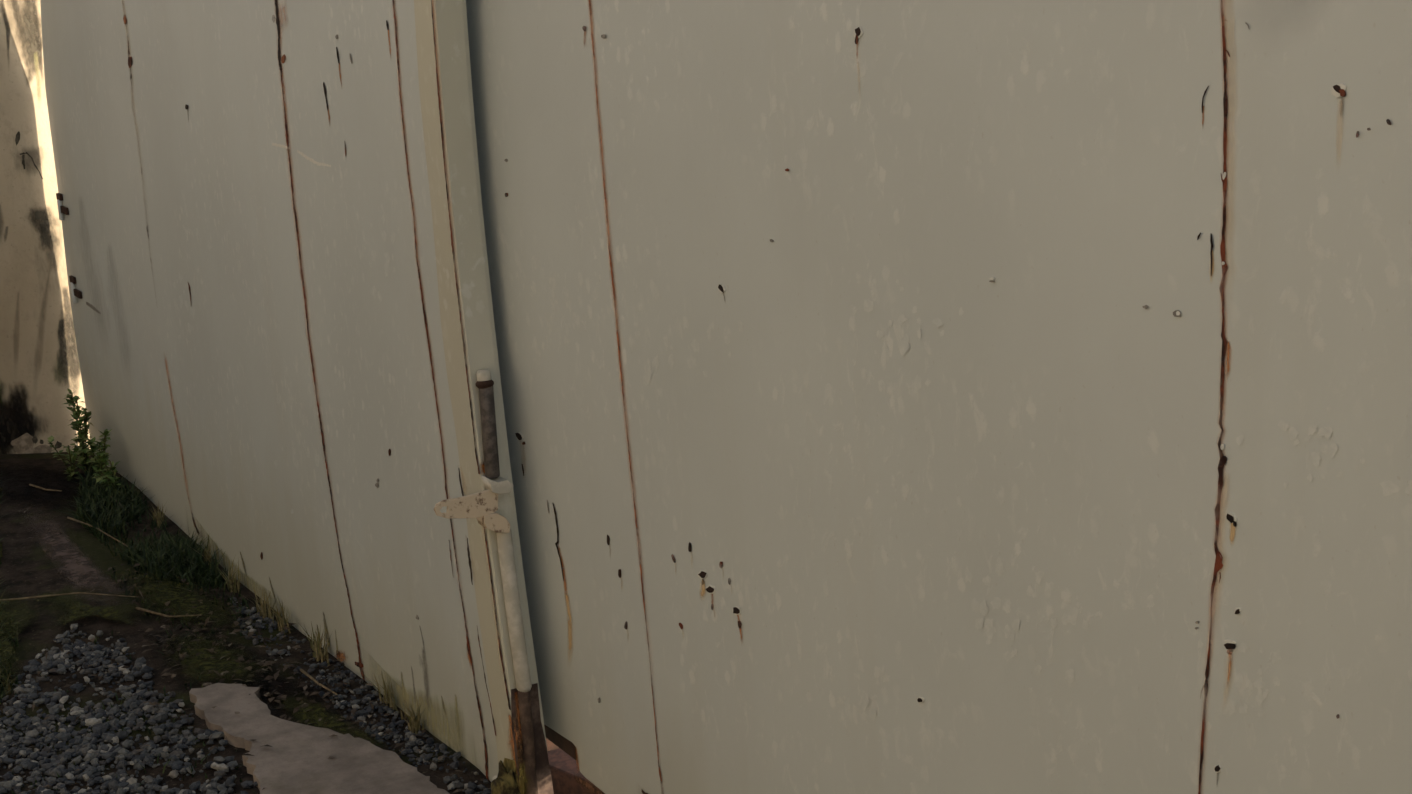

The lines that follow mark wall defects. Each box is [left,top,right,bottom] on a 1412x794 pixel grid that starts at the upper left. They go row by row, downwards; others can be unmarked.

water stain [1,0,42,93]
water stain [15,131,43,179]
water stain [30,210,58,249]
water stain [56,289,80,393]
rust [509,683,554,794]